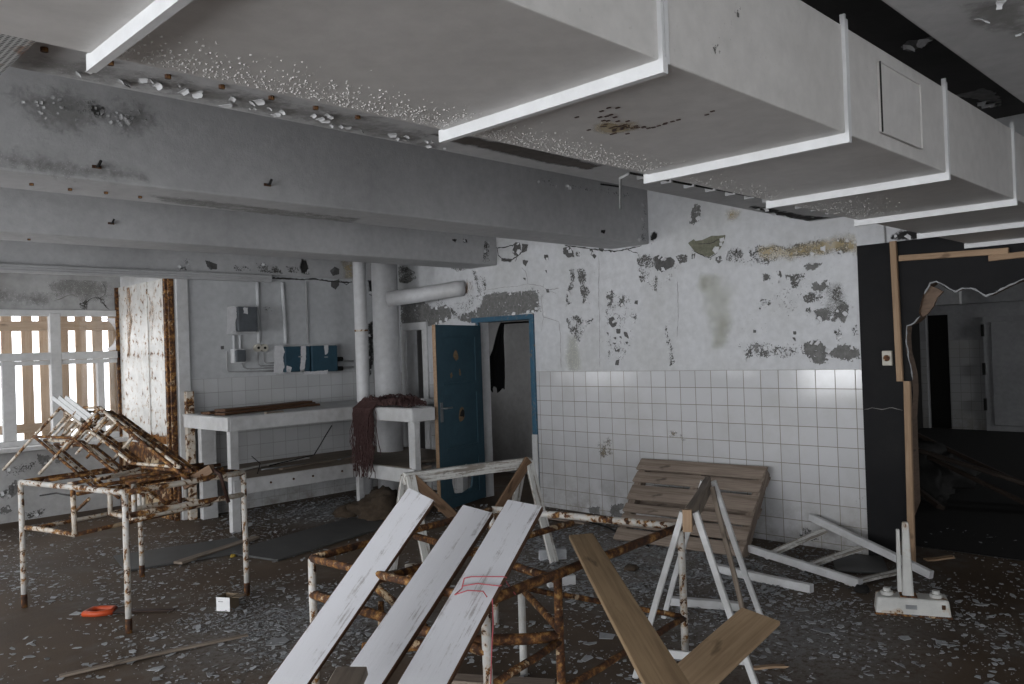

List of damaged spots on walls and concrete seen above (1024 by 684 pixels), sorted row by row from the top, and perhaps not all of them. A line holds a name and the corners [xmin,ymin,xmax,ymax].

peeling [900,36,934,52]
peeling [117,78,164,91]
peeling [178,84,203,99]
peeling [21,95,148,127]
peeling [249,99,286,117]
peeling [310,113,364,133]
rust [586,107,681,135]
peeling [398,241,549,331]
spalling [636,203,860,365]
peeling [563,246,638,367]